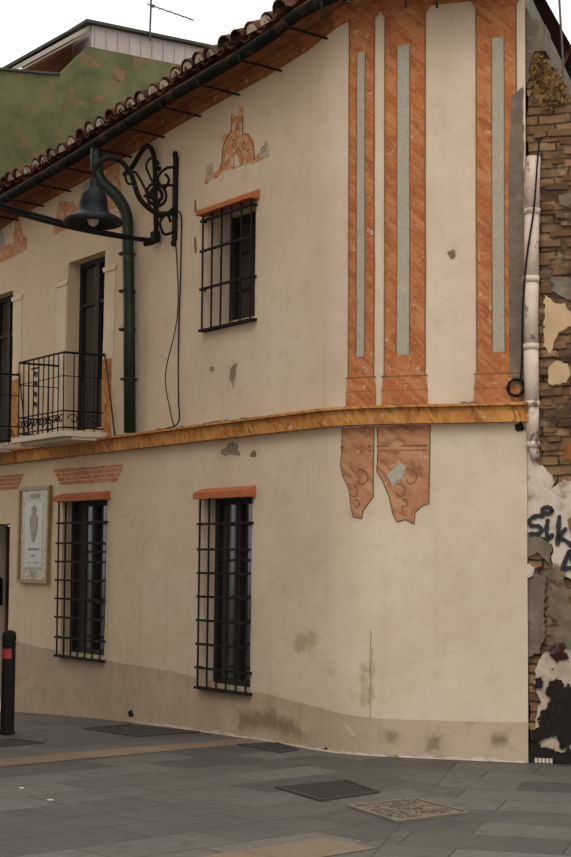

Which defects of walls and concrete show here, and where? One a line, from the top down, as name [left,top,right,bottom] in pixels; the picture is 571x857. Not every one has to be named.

peeling [559,193,571,207]
peeling [543,276,571,386]
spalling [228,362,238,388]
peeling [221,442,256,457]
peeling [527,448,571,765]